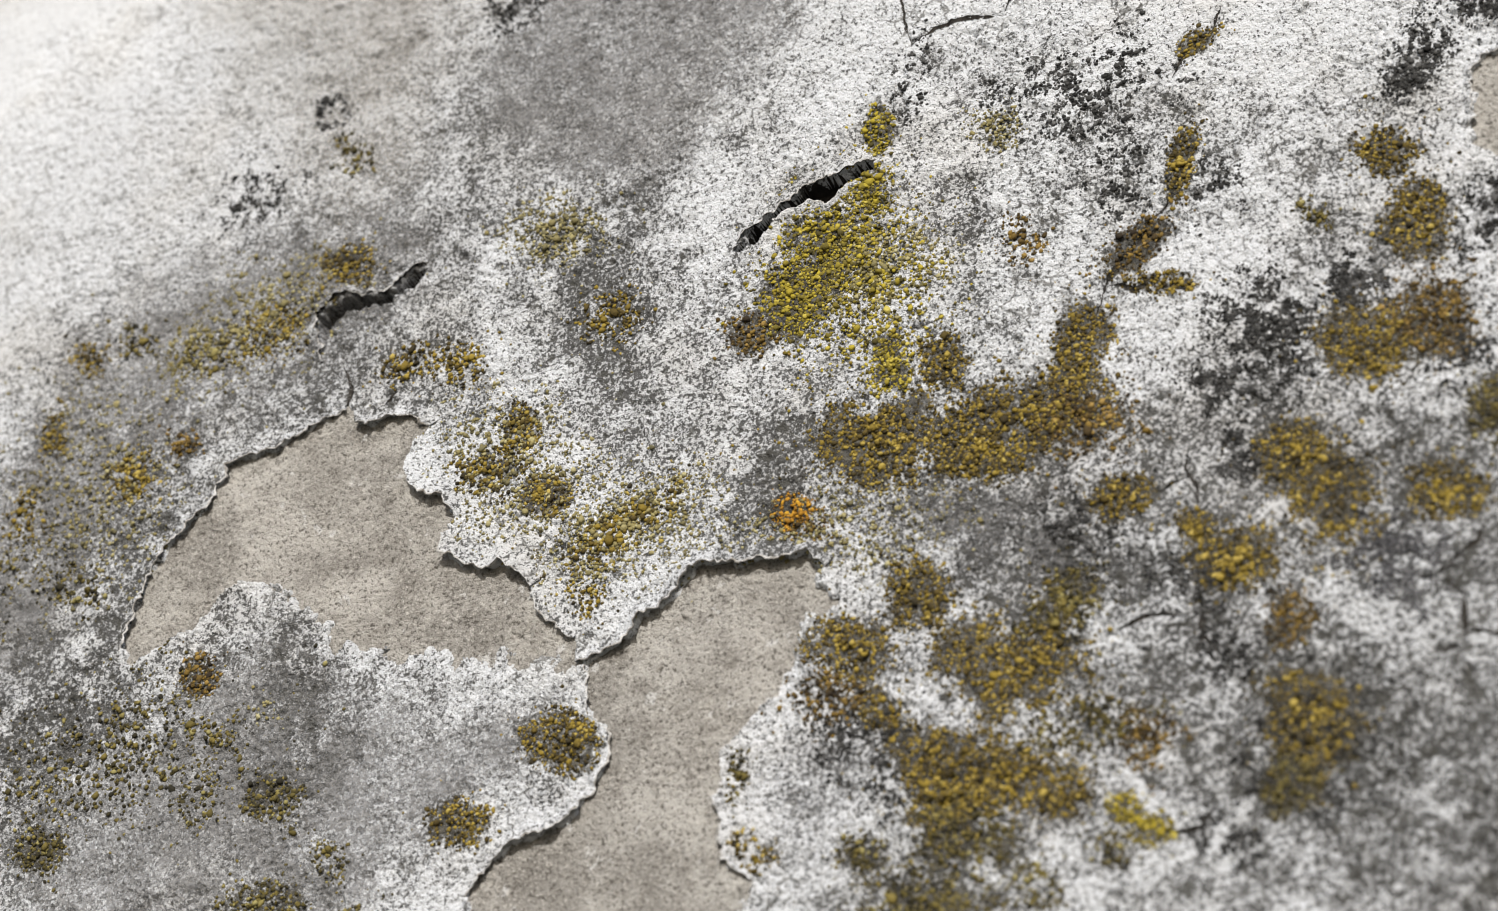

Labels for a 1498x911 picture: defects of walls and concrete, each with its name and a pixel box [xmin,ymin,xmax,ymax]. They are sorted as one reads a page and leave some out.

spalling [1459,40,1498,157]
crack [724,149,876,252]
crack [305,256,428,407]
spalling [114,400,840,911]